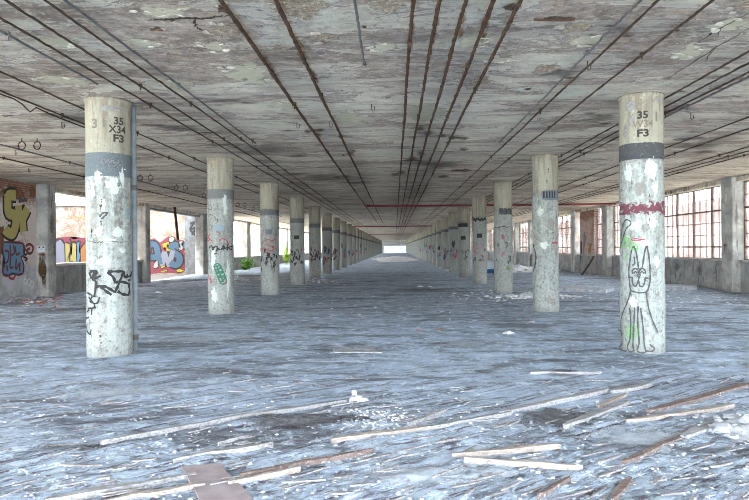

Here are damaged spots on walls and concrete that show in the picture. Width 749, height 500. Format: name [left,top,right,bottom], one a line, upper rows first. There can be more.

peeling [129,6,193,32]
crack [149,15,228,31]
spalling [534,15,607,48]
peeling [705,1,749,34]
peeling [669,43,708,60]
peeling [217,62,271,87]
peeling [90,167,126,212]
peeling [90,221,126,253]